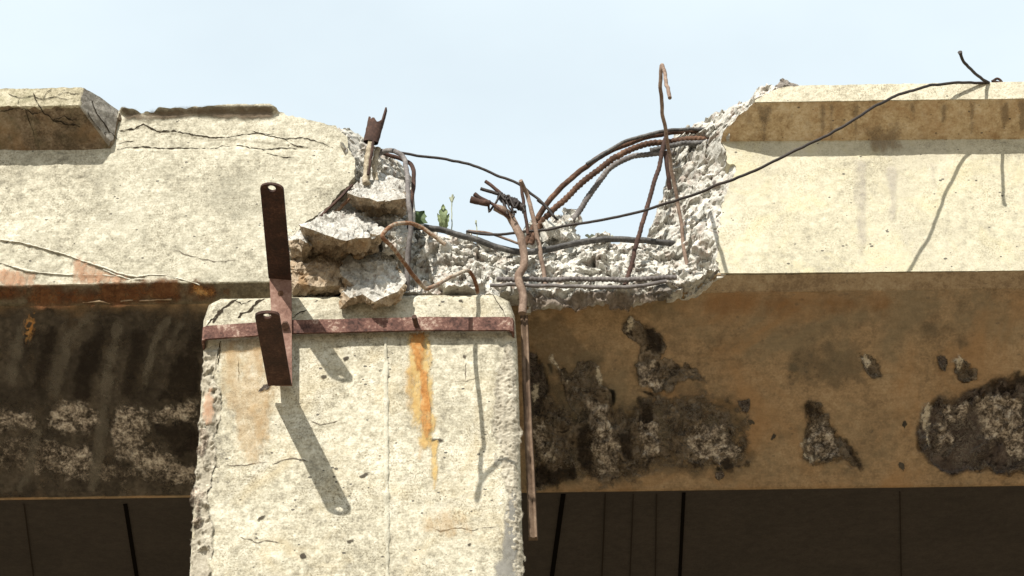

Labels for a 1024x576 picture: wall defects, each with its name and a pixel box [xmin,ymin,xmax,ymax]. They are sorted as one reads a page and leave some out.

crack [0,90,333,158]
leakage [0,304,206,498]
rust [0,260,226,340]
crack [207,299,264,377]
rust [406,333,438,486]
spalling [491,316,755,576]
spalling [801,401,862,470]
spalling [859,353,882,379]
spalling [902,355,1024,476]